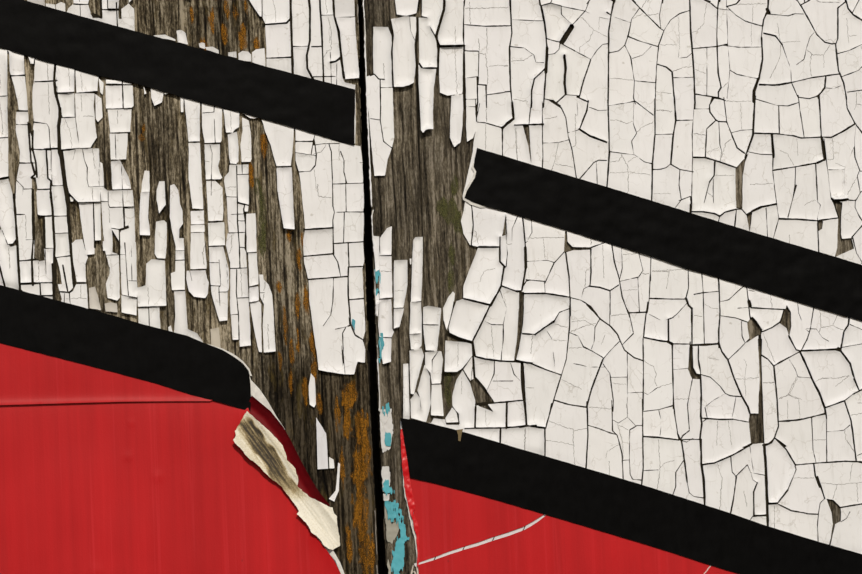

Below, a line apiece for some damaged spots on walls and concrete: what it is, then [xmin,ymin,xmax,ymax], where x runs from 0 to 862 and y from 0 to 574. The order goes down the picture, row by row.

peeling [45,0,74,12]
crack [27,0,135,31]
crack [154,30,188,45]
crack [199,42,219,54]
peeling [7,50,35,193]
peeling [30,177,45,261]
crack [0,48,365,375]
peeling [59,0,493,574]
crack [228,0,862,554]